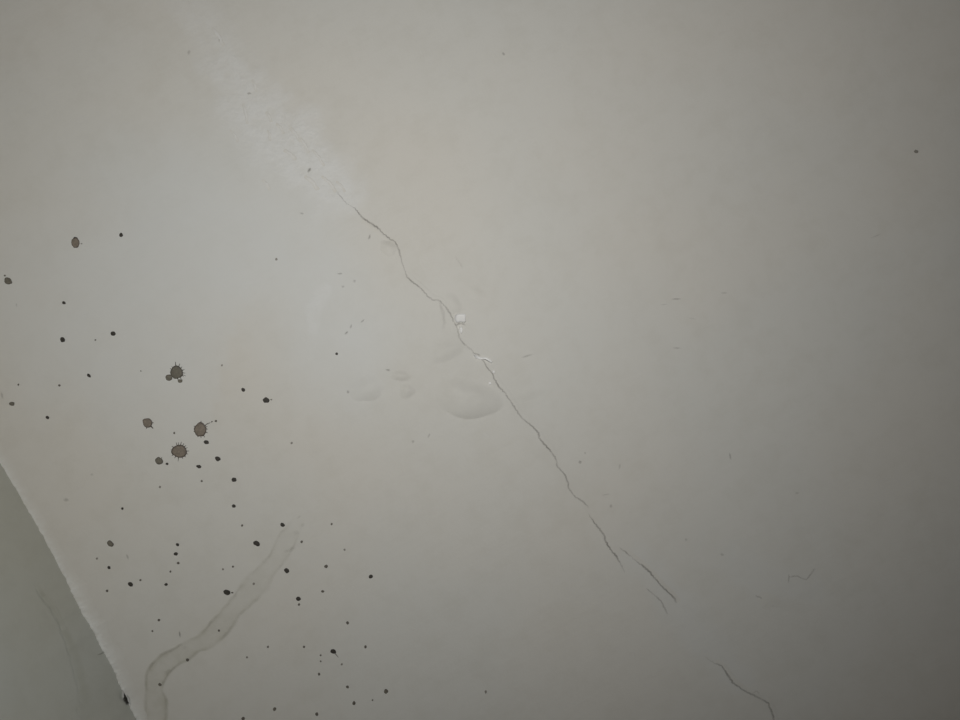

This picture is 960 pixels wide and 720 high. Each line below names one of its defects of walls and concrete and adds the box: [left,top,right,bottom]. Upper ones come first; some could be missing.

damp [143,506,307,720]